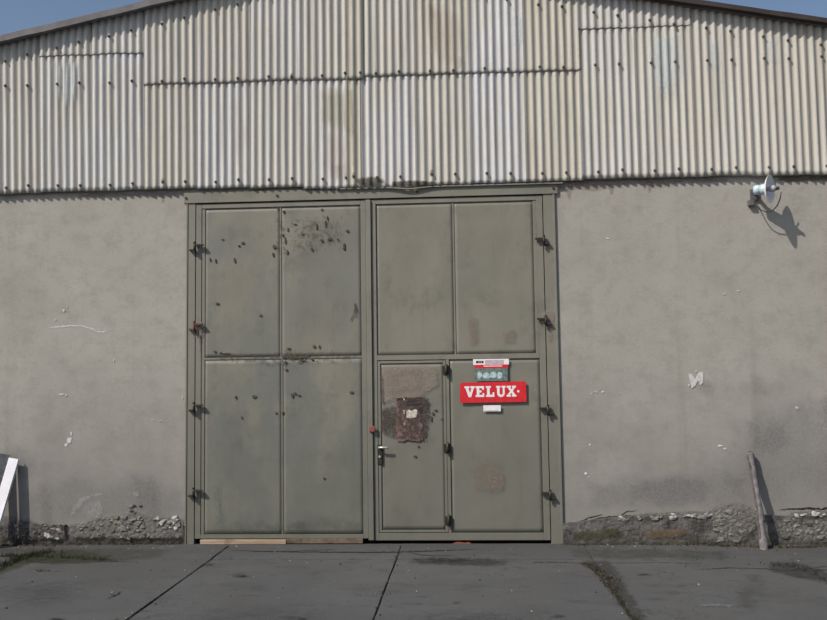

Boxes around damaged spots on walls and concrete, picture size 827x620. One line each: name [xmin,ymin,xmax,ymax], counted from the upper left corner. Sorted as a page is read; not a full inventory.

flaking render [0,504,184,540]
crack [780,504,827,512]